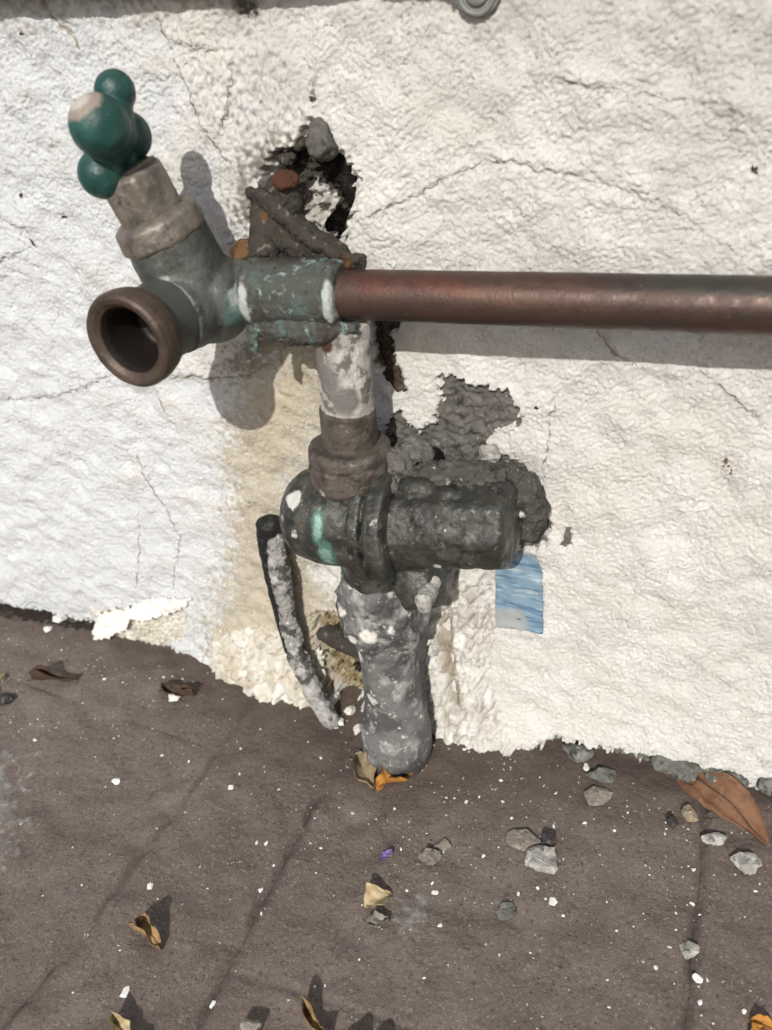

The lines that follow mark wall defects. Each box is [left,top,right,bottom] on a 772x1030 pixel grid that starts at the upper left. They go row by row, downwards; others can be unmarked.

spalling [276,117,357,239]
spalling [385,373,528,471]
crack [113,457,181,590]
damp [200,335,320,649]
spalling [519,519,552,549]
flaking render [560,527,573,547]
damp [285,542,342,693]